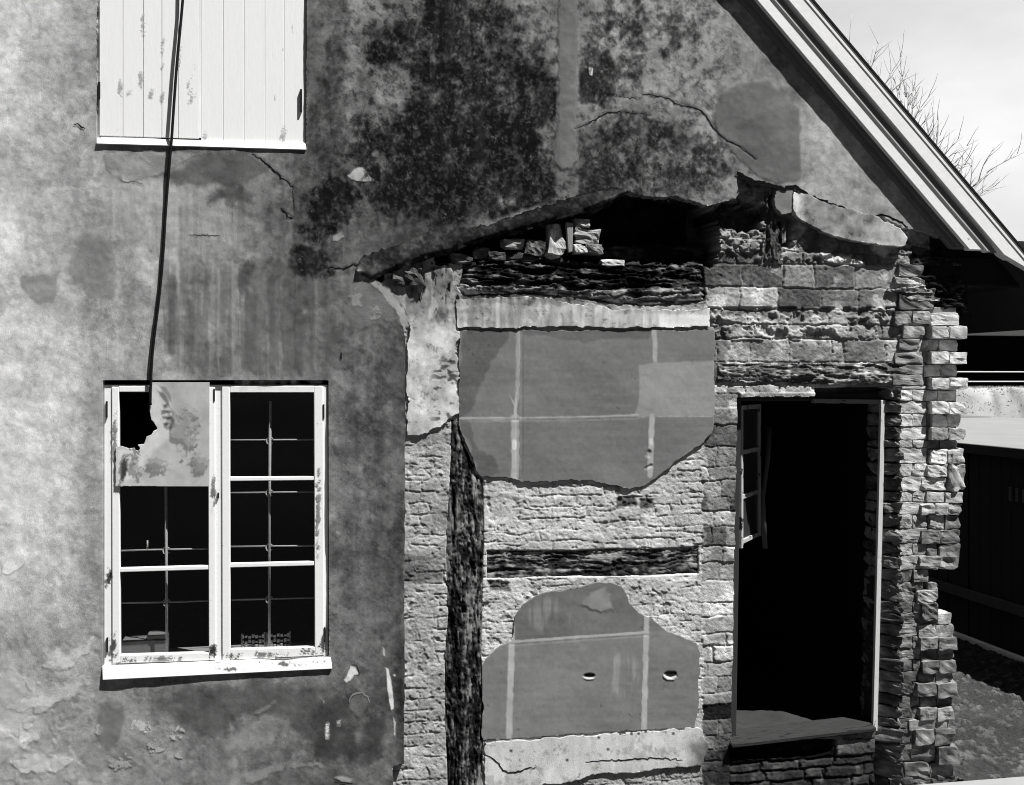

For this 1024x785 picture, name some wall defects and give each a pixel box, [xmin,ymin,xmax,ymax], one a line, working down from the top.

water stain [579,0,701,107]
water stain [21,154,266,303]
crack [252,154,295,219]
water stain [162,0,557,373]
water stain [579,117,735,201]
crack [574,94,908,228]
spalling [346,274,409,329]
spalling [344,664,370,717]
peeling [382,648,396,735]
crack [484,753,536,773]
crack [589,755,679,763]